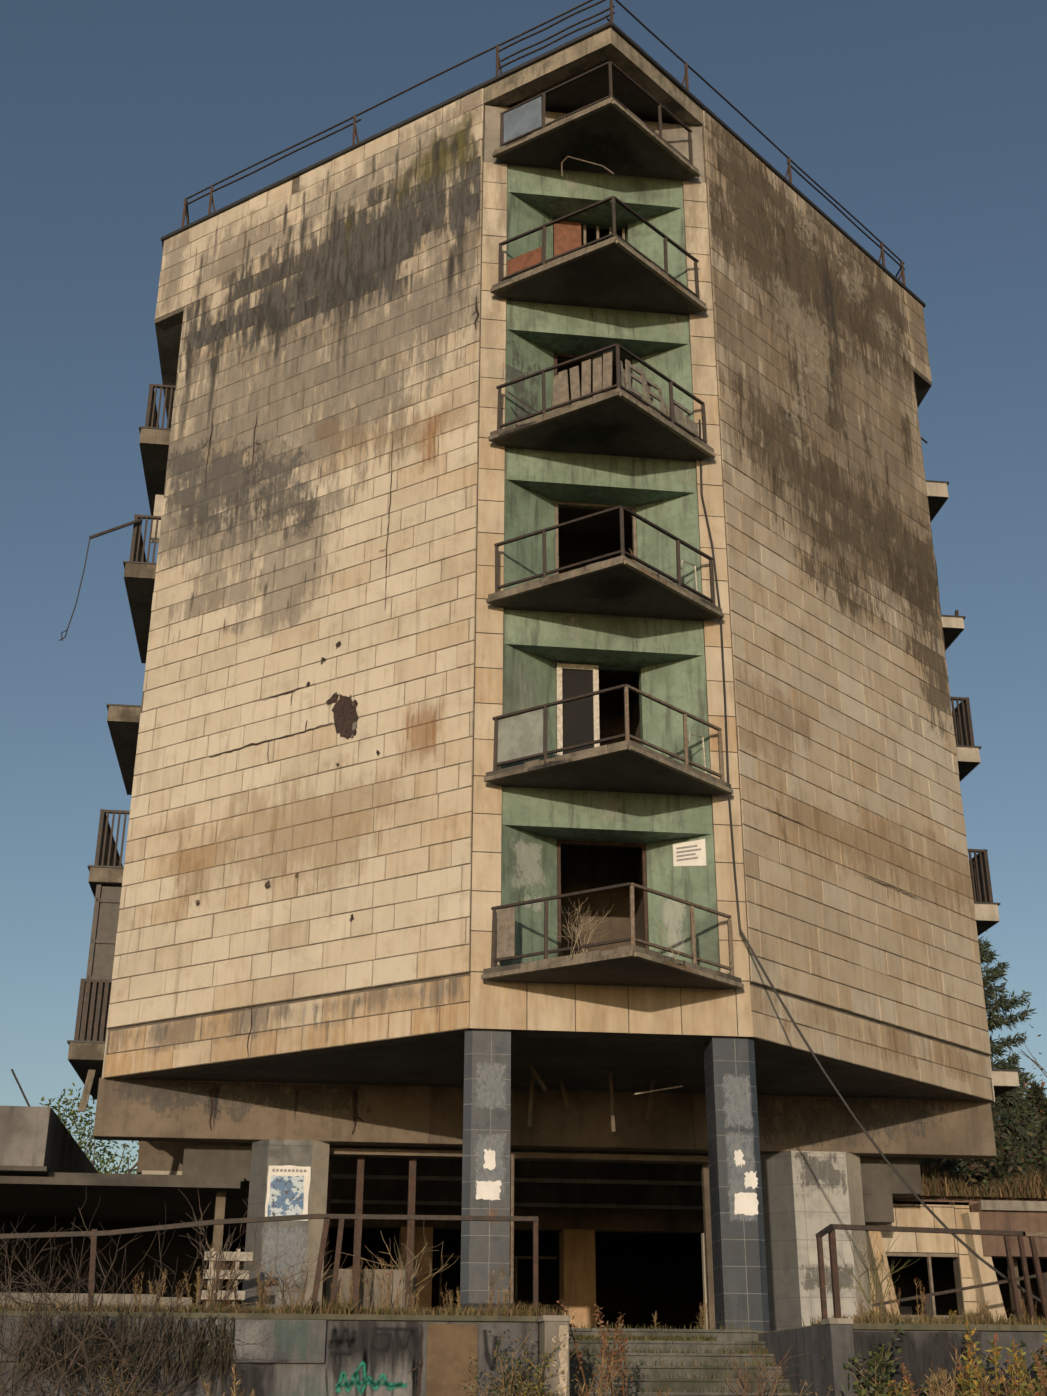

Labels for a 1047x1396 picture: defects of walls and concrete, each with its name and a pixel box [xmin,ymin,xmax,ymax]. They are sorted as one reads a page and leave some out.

damp [179,123,481,413]
damp [707,121,952,735]
damp [165,440,321,549]
crack [209,684,330,763]
hole [326,692,358,739]